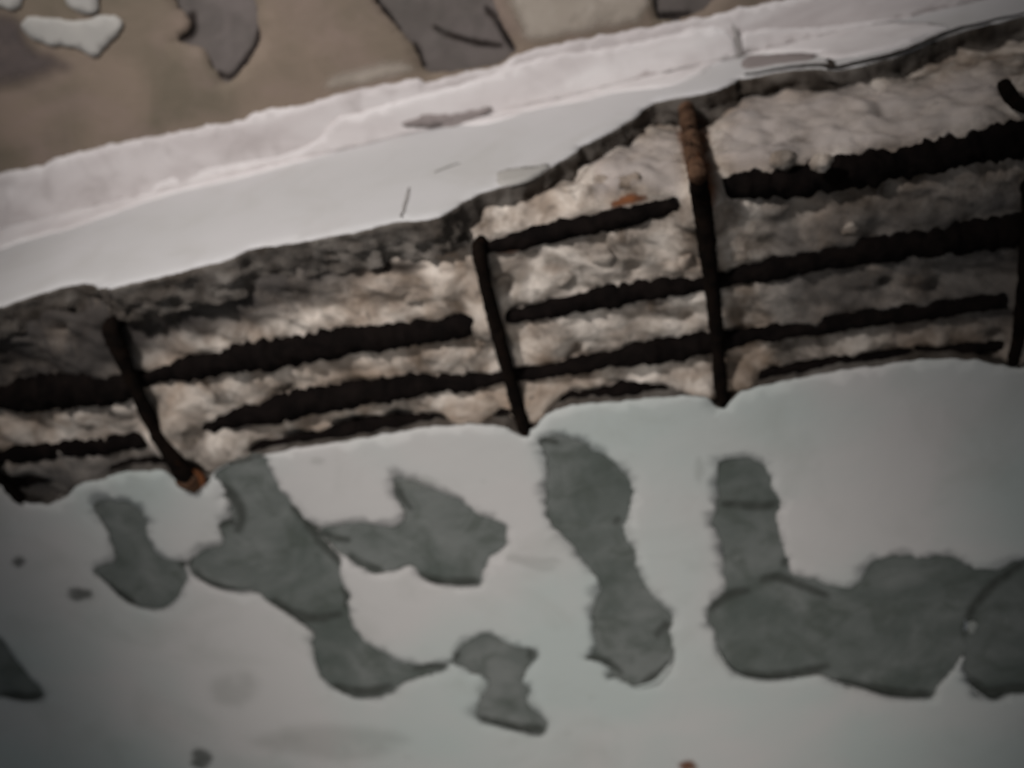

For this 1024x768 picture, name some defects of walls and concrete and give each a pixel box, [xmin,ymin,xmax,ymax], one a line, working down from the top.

peeling [0,0,980,249]
spalling [698,40,1024,273]
spalling [0,124,1024,736]